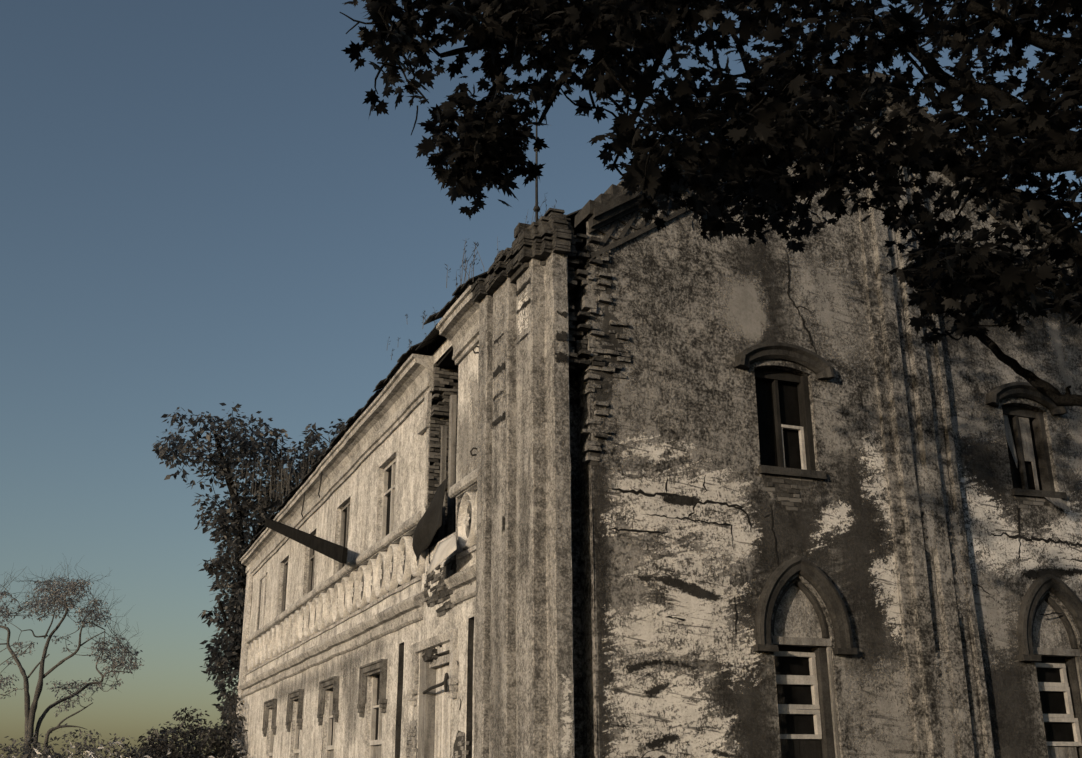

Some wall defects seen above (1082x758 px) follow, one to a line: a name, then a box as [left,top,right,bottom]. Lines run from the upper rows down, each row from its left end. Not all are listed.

water stain [939,278,1082,394]
water stain [985,382,1068,415]
crack [607,475,779,566]
water stain [959,430,1009,509]
crack [987,502,1082,565]
water stain [594,463,614,758]
water stain [715,451,903,758]
water stain [984,574,1082,758]